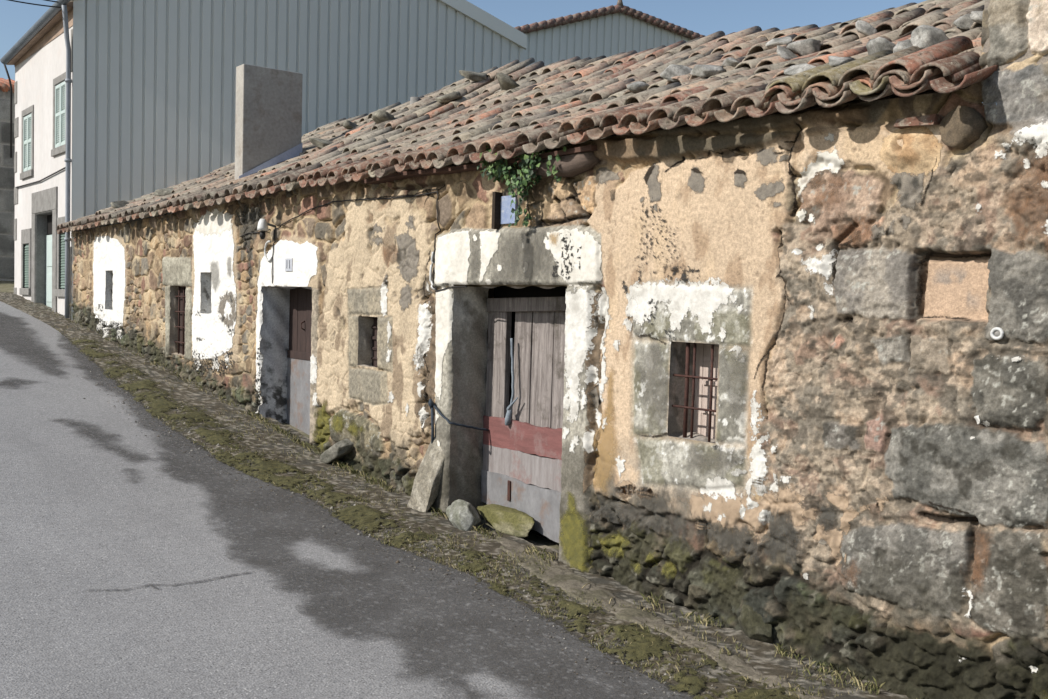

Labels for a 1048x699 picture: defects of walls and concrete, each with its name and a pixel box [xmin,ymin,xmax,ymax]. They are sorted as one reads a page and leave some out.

peeling [191,208,236,371]
peeling [543,163,745,493]
crack [665,123,802,419]
peeling [791,244,838,295]
spalling [870,172,925,239]
peeling [994,118,1048,169]
water stain [0,313,696,699]
peeling [614,455,657,500]
water stain [697,512,800,569]
peeling [677,390,888,568]